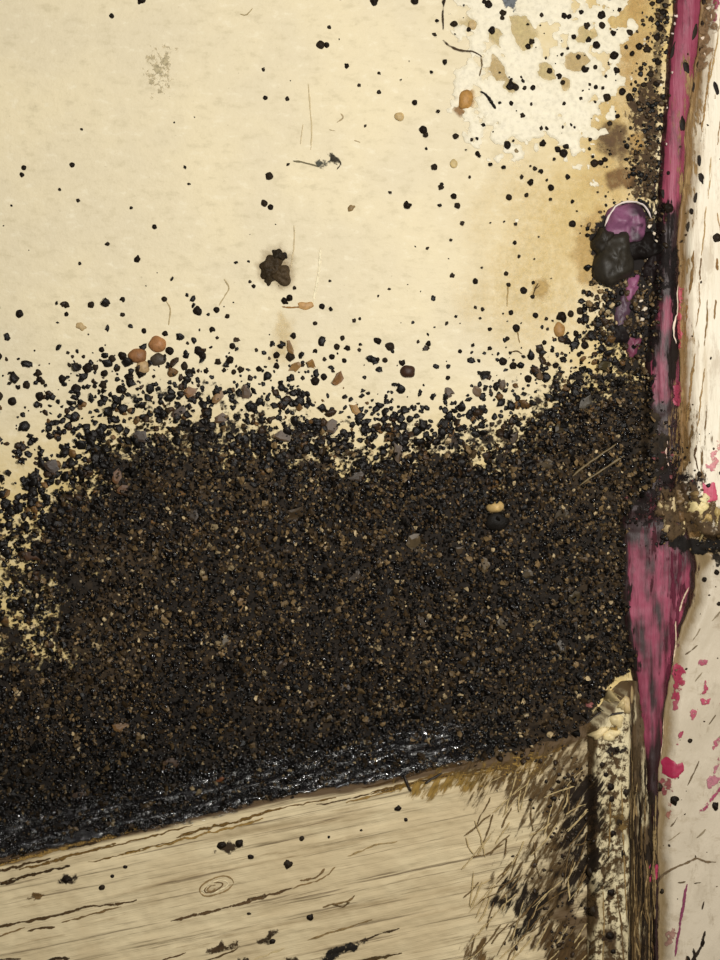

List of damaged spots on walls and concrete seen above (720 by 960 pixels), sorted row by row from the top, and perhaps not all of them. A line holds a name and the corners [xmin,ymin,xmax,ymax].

water stain [482,0,507,34]
water stain [584,22,600,49]
water stain [597,10,618,36]
water stain [498,71,535,118]
water stain [579,83,611,103]
water stain [453,123,506,169]
water stain [539,126,569,161]
water stain [88,297,147,350]
water stain [328,365,344,385]
water stain [364,355,388,372]
water stain [215,839,243,853]